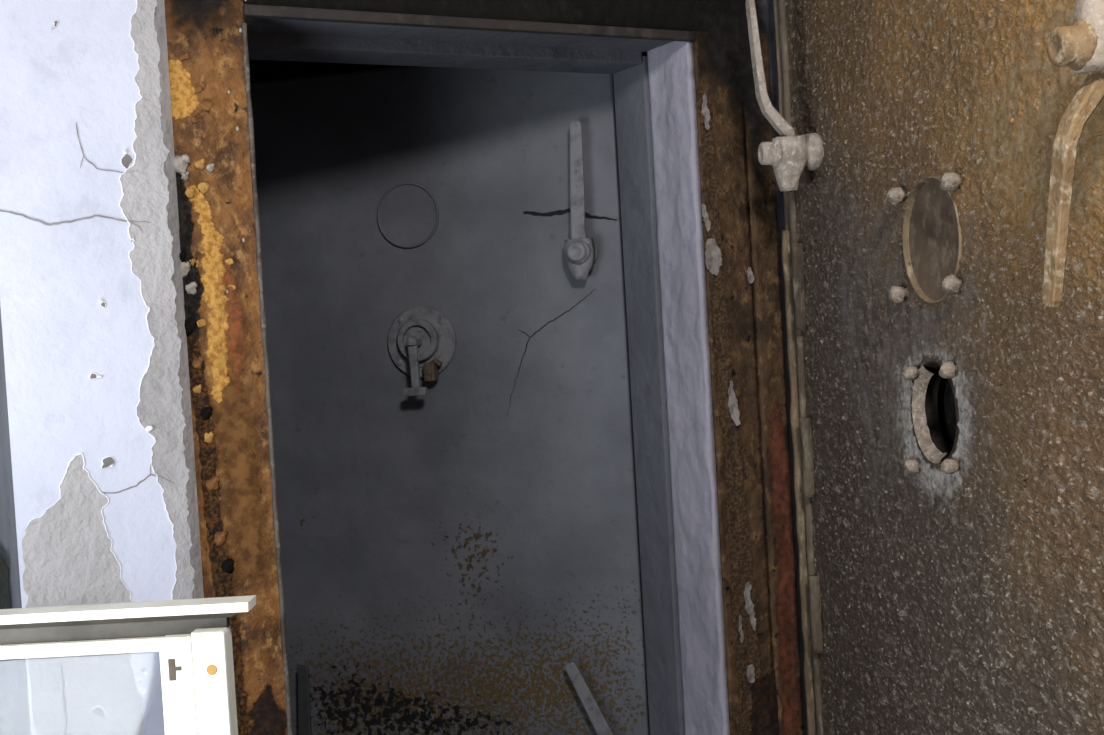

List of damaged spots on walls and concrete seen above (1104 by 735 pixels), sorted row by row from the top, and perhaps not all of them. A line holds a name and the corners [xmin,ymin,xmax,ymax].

crack [0,210,151,233]
crack [76,123,137,173]
peeling [119,0,236,600]
rust [208,253,274,583]
peeling [22,453,132,608]
peeling [29,653,149,735]
spalling [229,614,287,735]
rust [288,516,650,735]
rust [770,401,800,735]